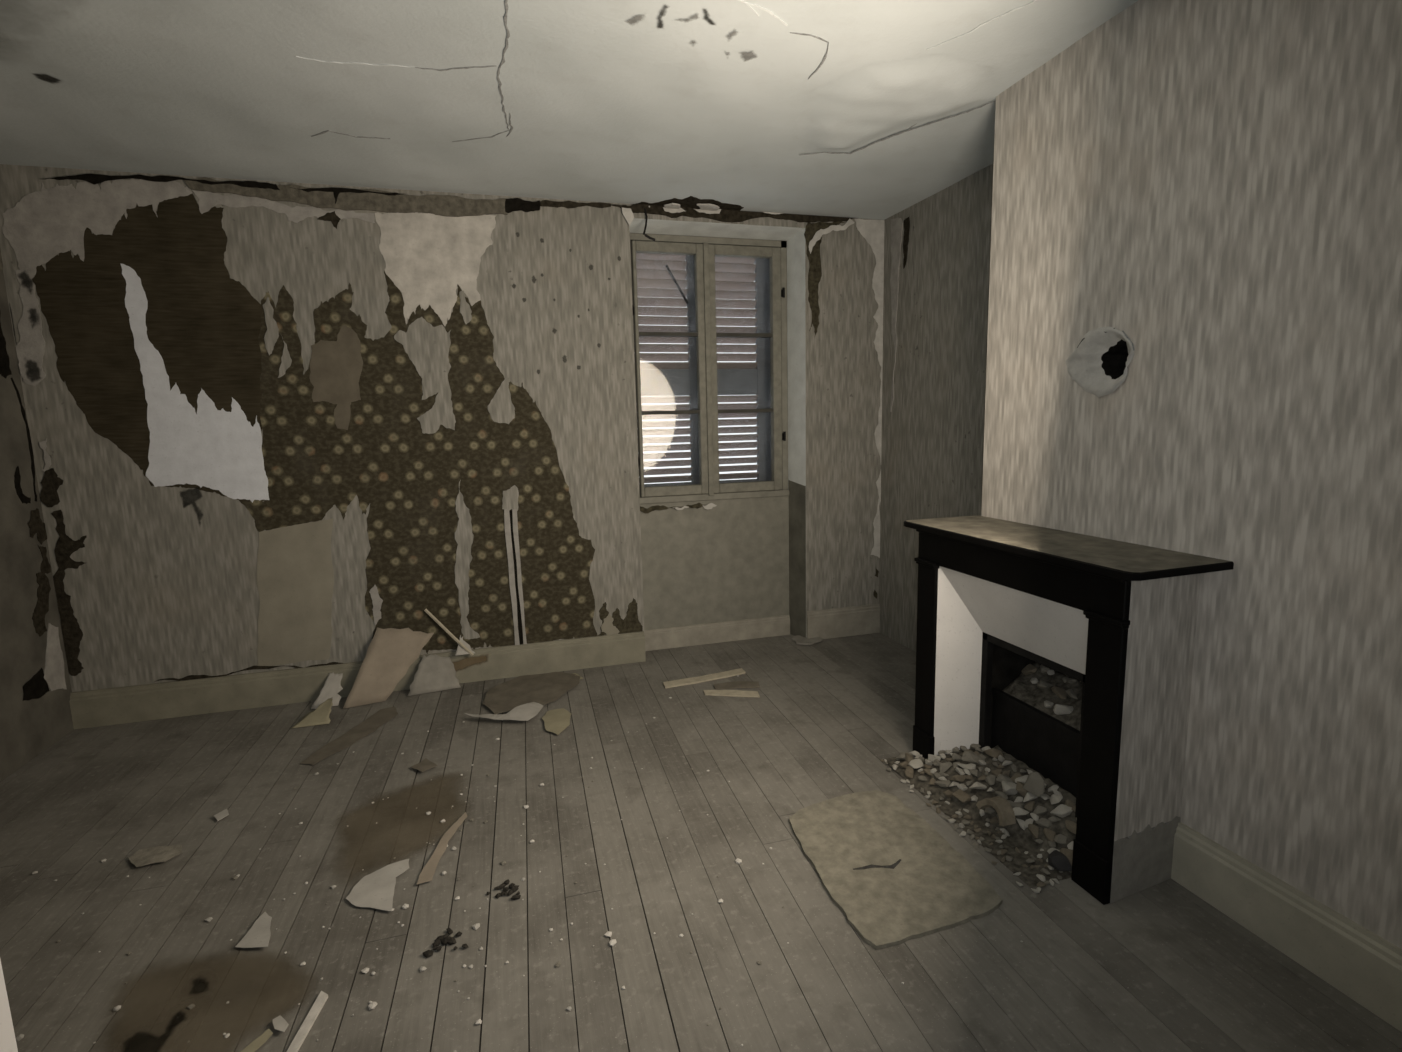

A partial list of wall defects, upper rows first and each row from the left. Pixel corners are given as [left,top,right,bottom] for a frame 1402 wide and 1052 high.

damp [35,74,60,84]
crack [296,0,513,142]
crack [738,0,829,79]
spalling [622,196,782,225]
flaking render [0,173,541,434]
flaking render [120,263,269,503]
peeling [502,485,519,511]
peeling [455,480,480,639]
flaking render [23,623,67,701]
peeling [369,585,383,626]
peeling [601,614,619,635]